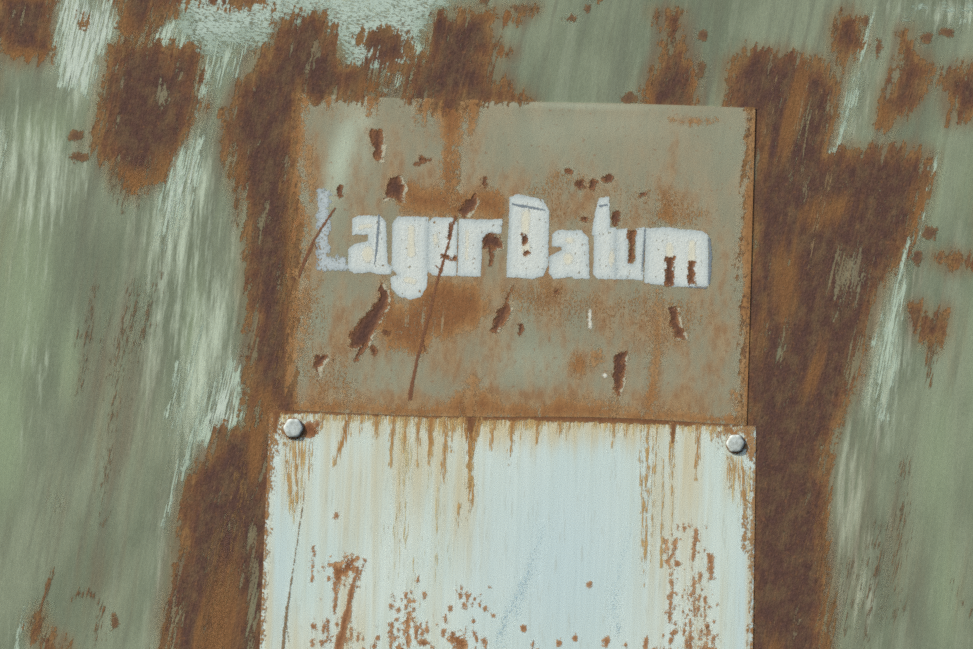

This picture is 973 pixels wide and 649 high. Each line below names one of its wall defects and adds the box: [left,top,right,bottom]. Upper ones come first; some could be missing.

corrosion [0,0,59,67]
corrosion [68,0,268,215]
corrosion [872,27,973,135]
corrosion [158,0,936,649]
corrosion [907,297,951,389]
corrosion [22,566,73,649]
corrosion [71,589,119,646]